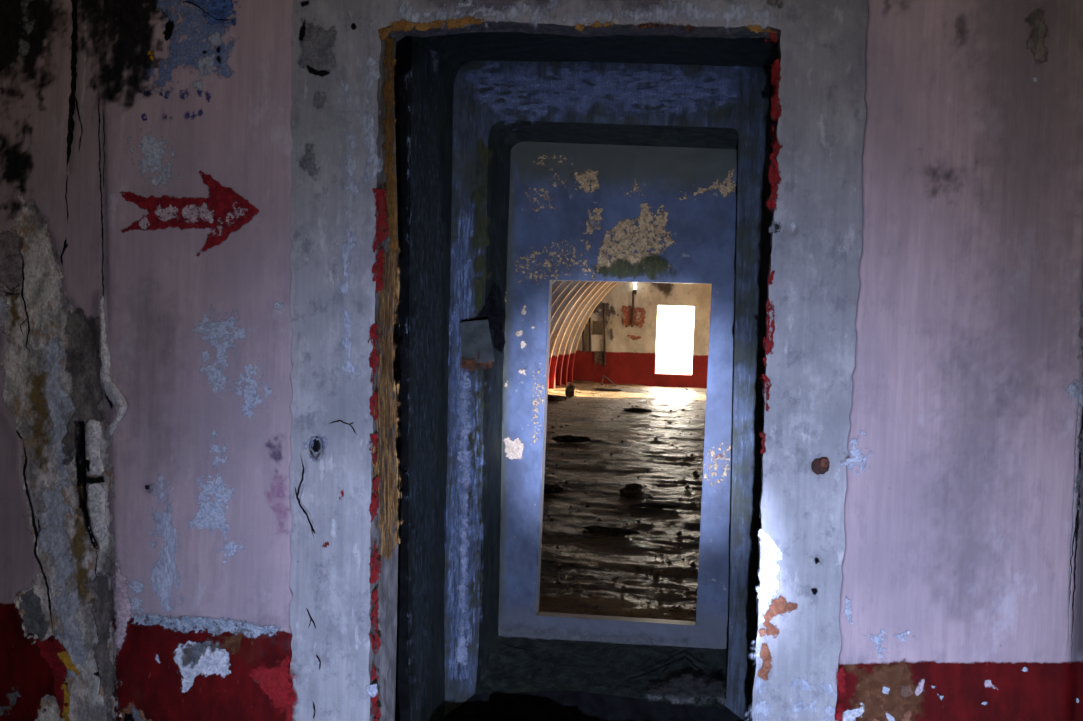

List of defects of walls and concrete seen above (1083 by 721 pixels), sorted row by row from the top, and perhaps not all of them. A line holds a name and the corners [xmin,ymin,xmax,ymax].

peeling [147,0,237,97]
peeling [525,154,600,212]
peeling [679,168,737,201]
peeling [515,179,676,285]
spalling [461,291,534,353]
crack [16,429,56,633]
spalling [0,195,281,721]
crack [295,455,317,534]
peeling [841,431,873,475]
peeling [248,656,296,712]
peeling [835,629,944,721]